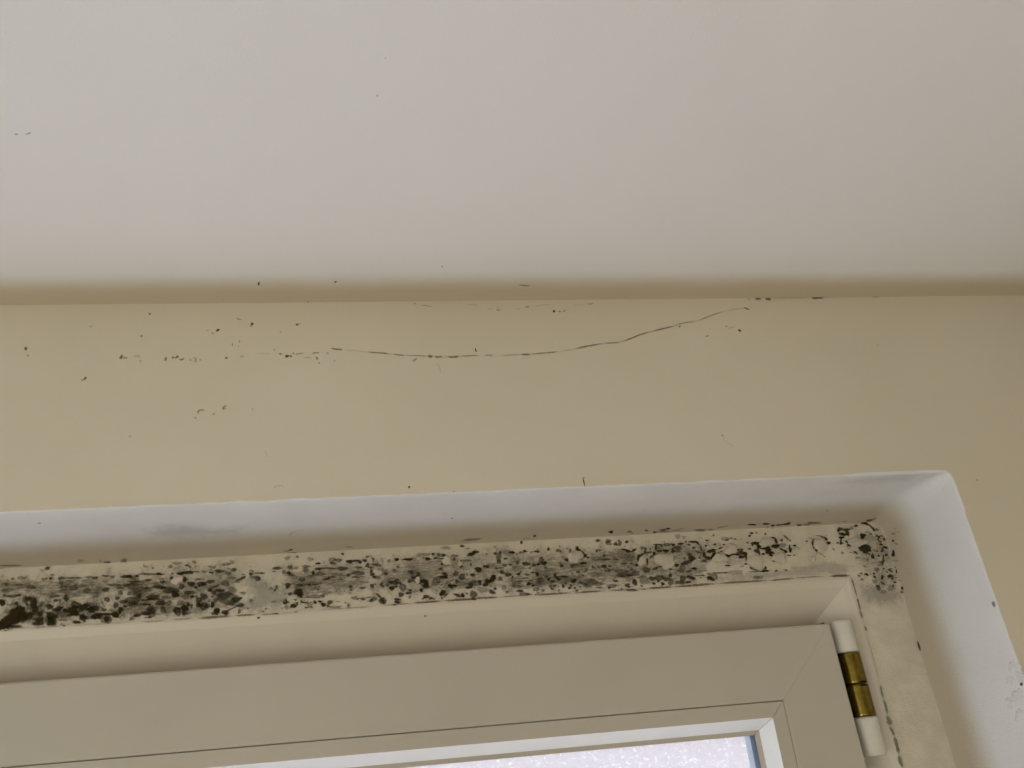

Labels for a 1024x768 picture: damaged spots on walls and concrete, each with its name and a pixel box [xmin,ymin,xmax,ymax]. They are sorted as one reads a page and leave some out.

leakage [0,519,903,629]